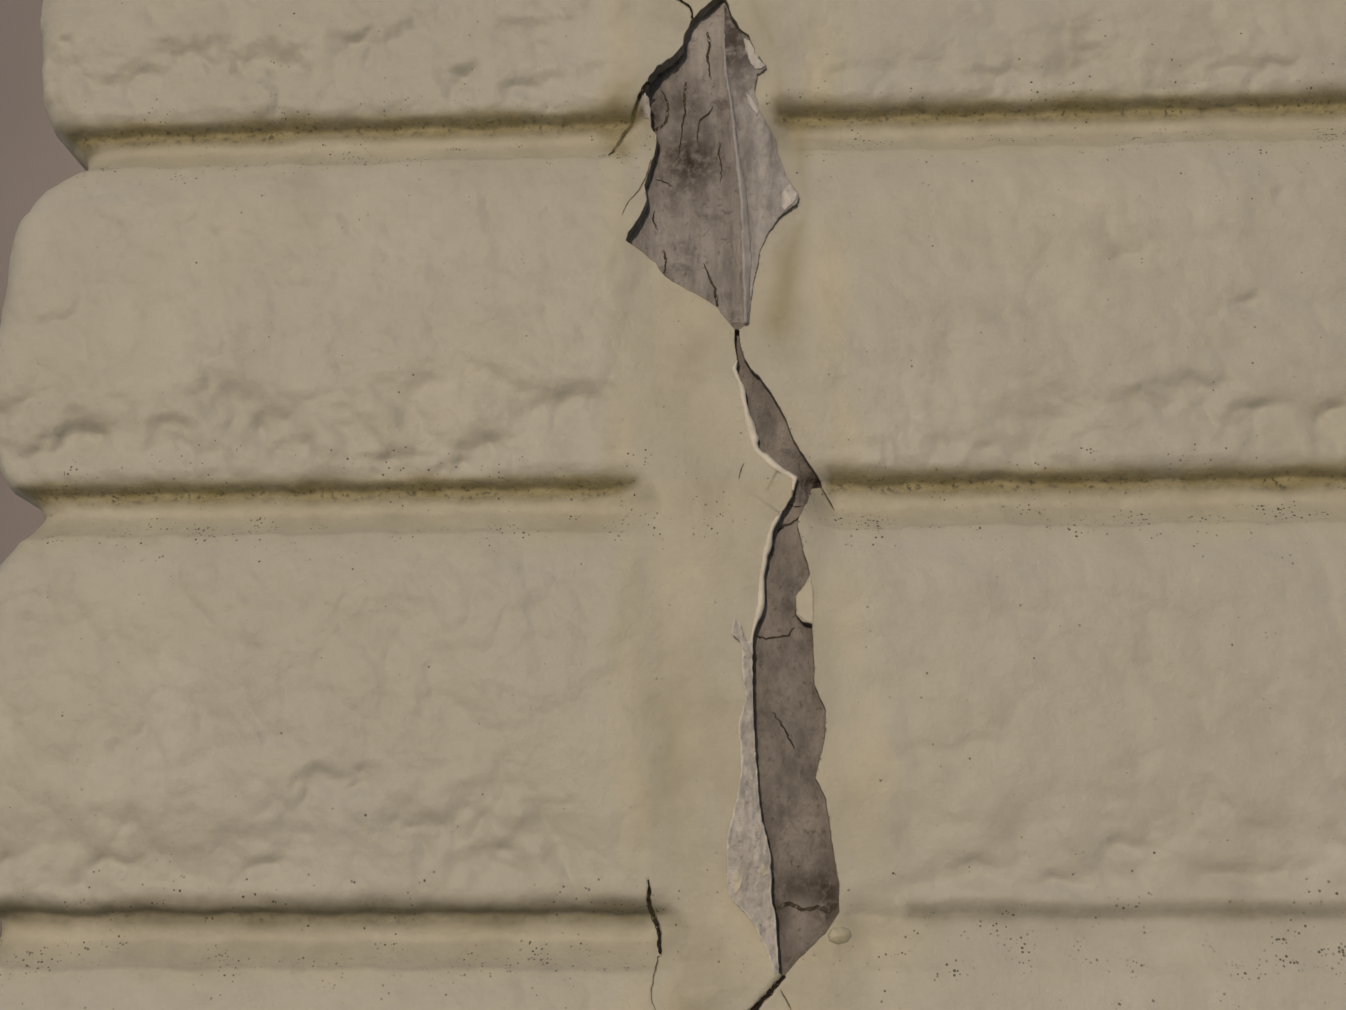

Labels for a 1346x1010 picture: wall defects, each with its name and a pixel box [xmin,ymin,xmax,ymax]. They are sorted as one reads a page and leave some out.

crack [601,81,650,157]
crack [623,159,651,212]
peeling [625,0,840,976]
crack [646,880,662,1010]
crack [750,975,791,1010]